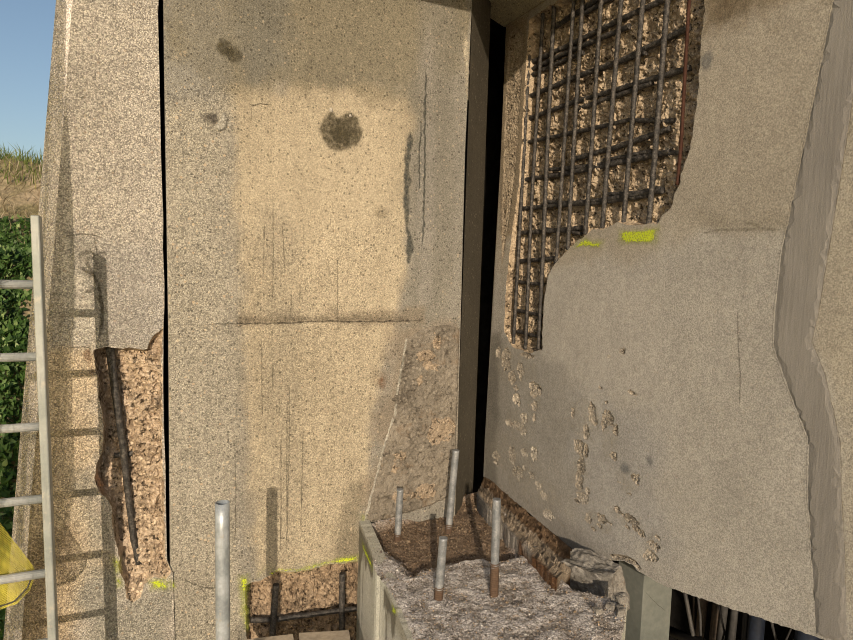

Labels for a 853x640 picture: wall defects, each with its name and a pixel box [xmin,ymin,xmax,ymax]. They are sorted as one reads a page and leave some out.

water stain [218,42,240,61]
water stain [321,108,361,149]
water stain [404,75,427,263]
spalling [496,0,705,436]
crack [86,234,103,349]
spalling [93,327,171,603]
spalling [492,445,556,521]
spalling [574,400,619,532]
spalling [610,506,661,570]
spalling [244,561,358,640]